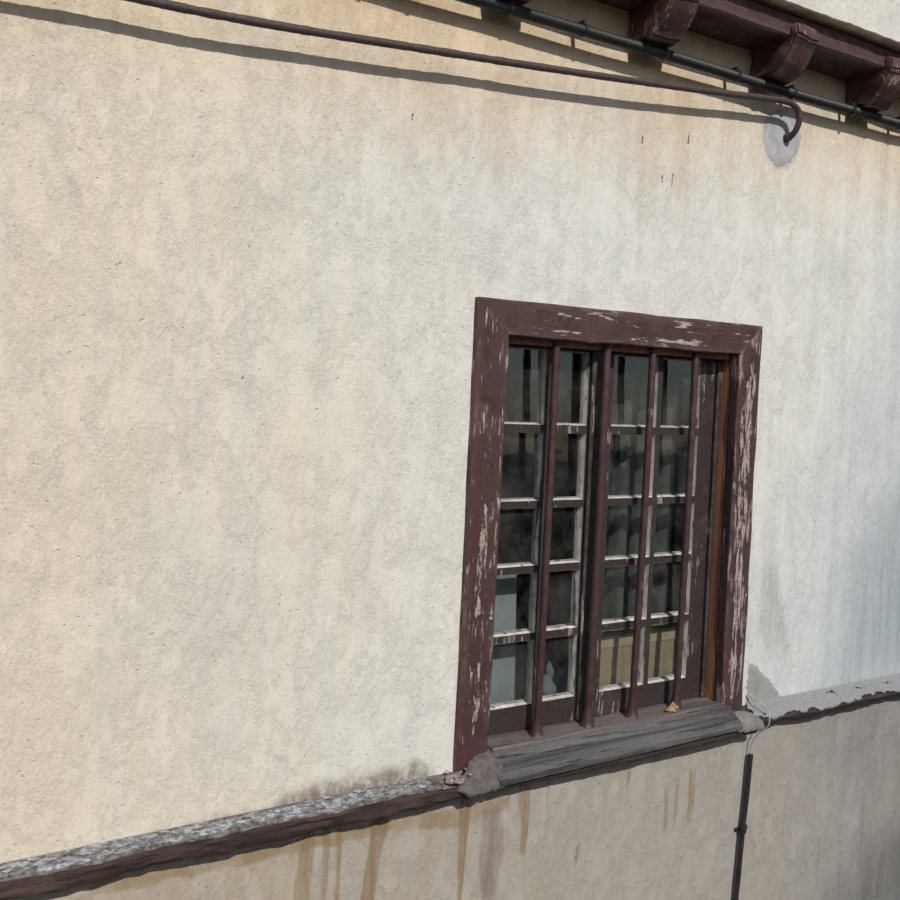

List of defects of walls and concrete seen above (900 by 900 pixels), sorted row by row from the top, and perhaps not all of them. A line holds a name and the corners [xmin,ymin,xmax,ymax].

flaking render [747,673,900,720]
water stain [244,849,270,863]